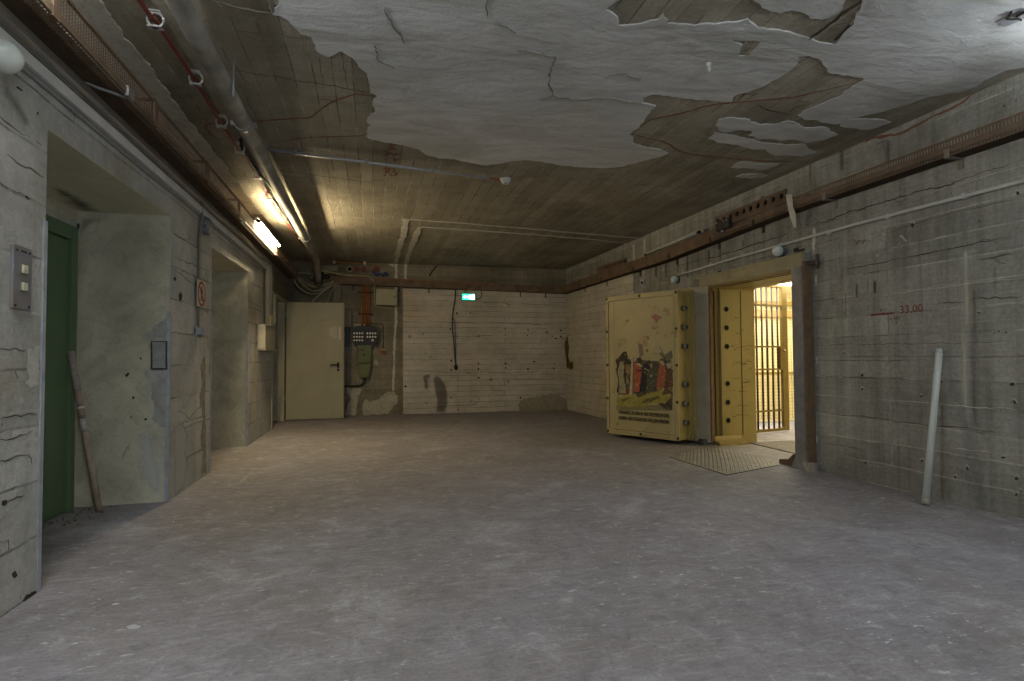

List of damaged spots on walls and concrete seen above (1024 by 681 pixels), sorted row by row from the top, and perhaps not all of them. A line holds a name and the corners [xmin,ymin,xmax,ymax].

crack [374,6,404,68]
crack [485,0,642,103]
flaking render [272,0,1024,168]
crack [0,413,33,464]